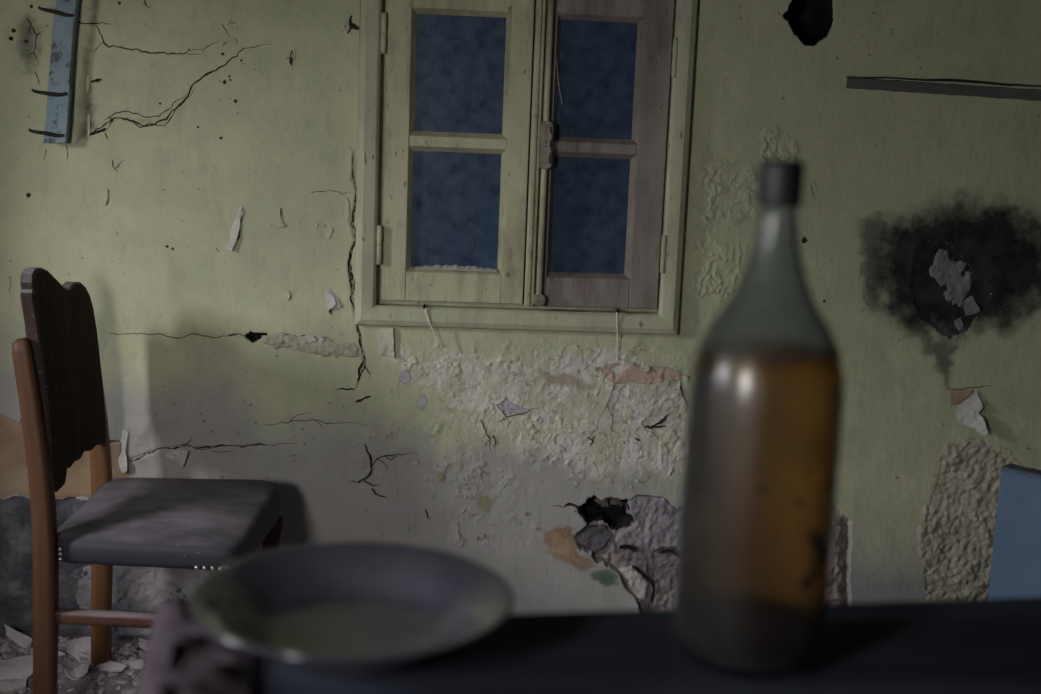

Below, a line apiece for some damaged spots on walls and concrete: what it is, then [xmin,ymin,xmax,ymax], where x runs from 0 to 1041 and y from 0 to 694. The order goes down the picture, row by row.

crack [77,19,271,171]
crack [110,158,412,498]
peeling [257,122,810,610]
flaking render [929,248,980,338]
damp [876,203,1041,335]
flaking render [0,415,33,636]
flaking render [55,451,91,530]
flaking render [59,561,91,609]
flaking render [110,429,129,480]
flaking render [112,565,214,612]
flaking render [827,507,848,604]
flaking render [915,389,1025,601]